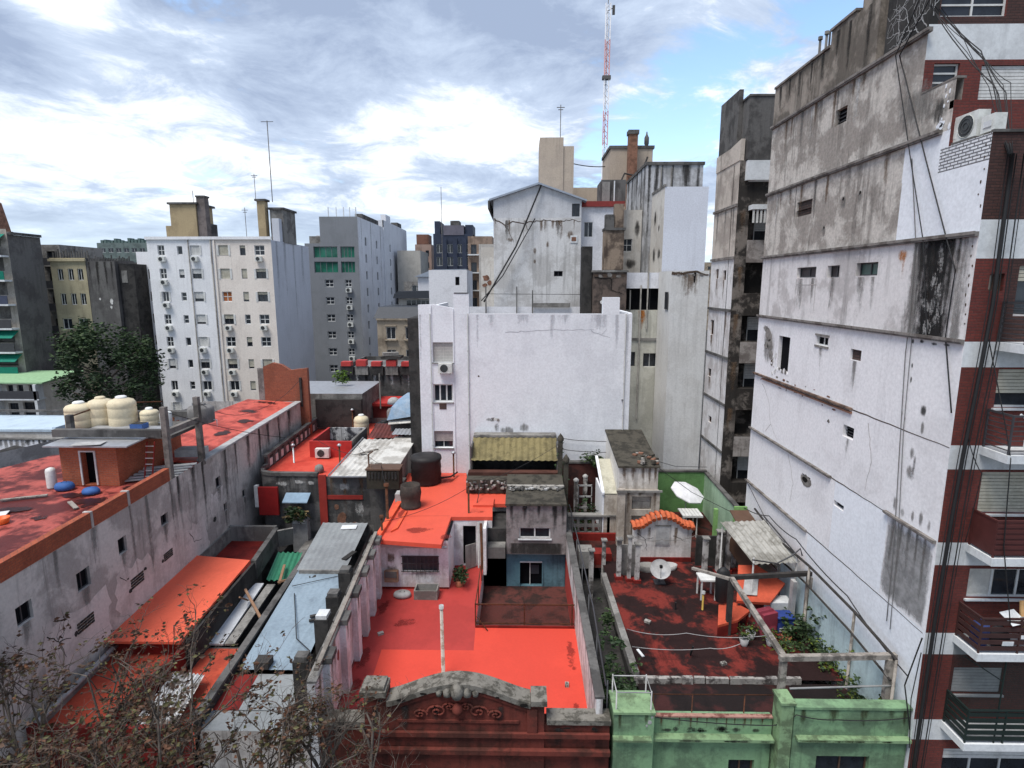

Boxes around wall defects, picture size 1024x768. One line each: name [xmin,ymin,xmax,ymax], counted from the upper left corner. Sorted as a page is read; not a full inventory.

water stain [780,20,852,102]
water stain [786,90,839,131]
water stain [901,88,943,122]
crack [494,218,581,242]
water stain [906,237,969,346]
crack [505,329,610,338]
water stain [881,501,932,624]